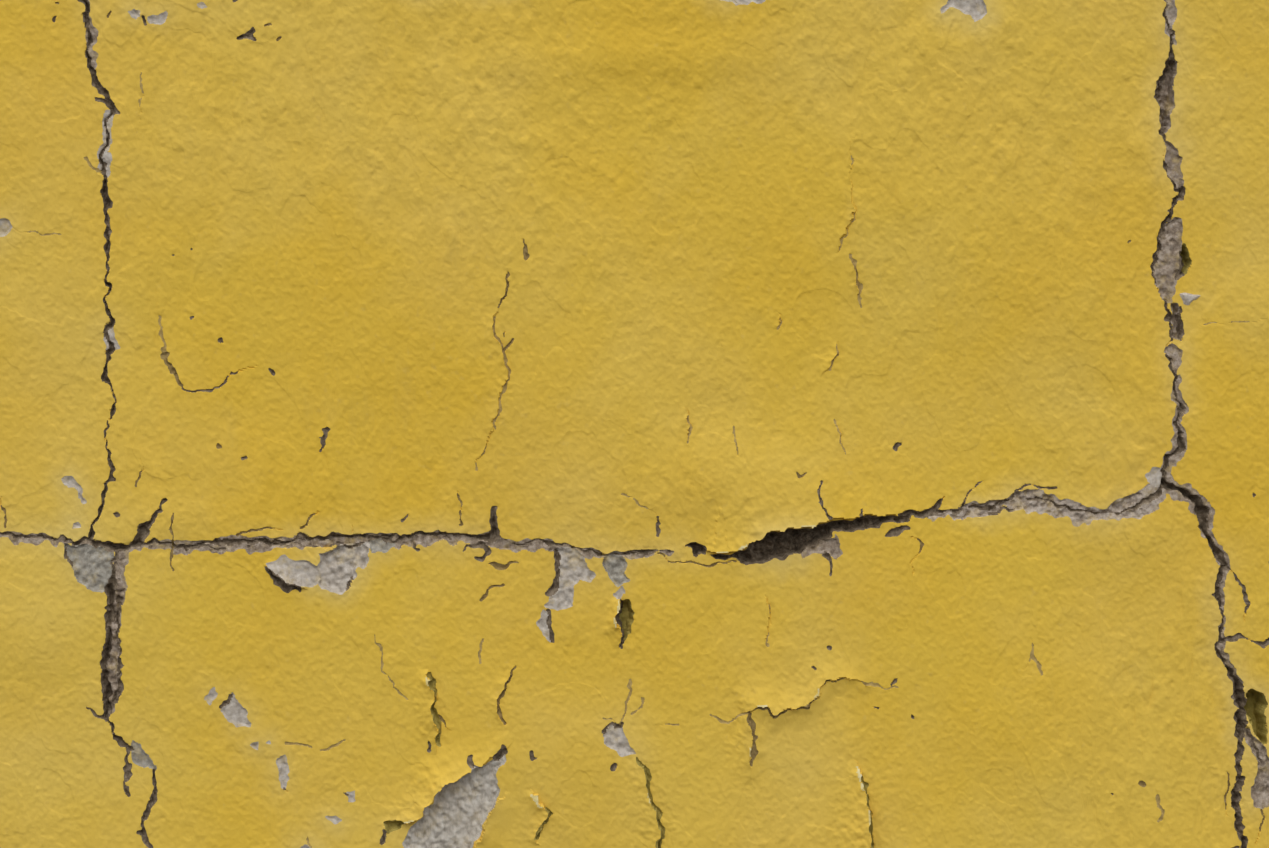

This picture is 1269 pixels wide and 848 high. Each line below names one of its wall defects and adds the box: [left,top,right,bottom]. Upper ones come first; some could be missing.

peeling [940,0,987,22]
peeling [0,218,12,237]
crack [0,0,605,848]
crack [612,0,1269,848]
spalling [265,538,396,595]
spalling [379,744,508,848]
peeling [602,679,665,848]